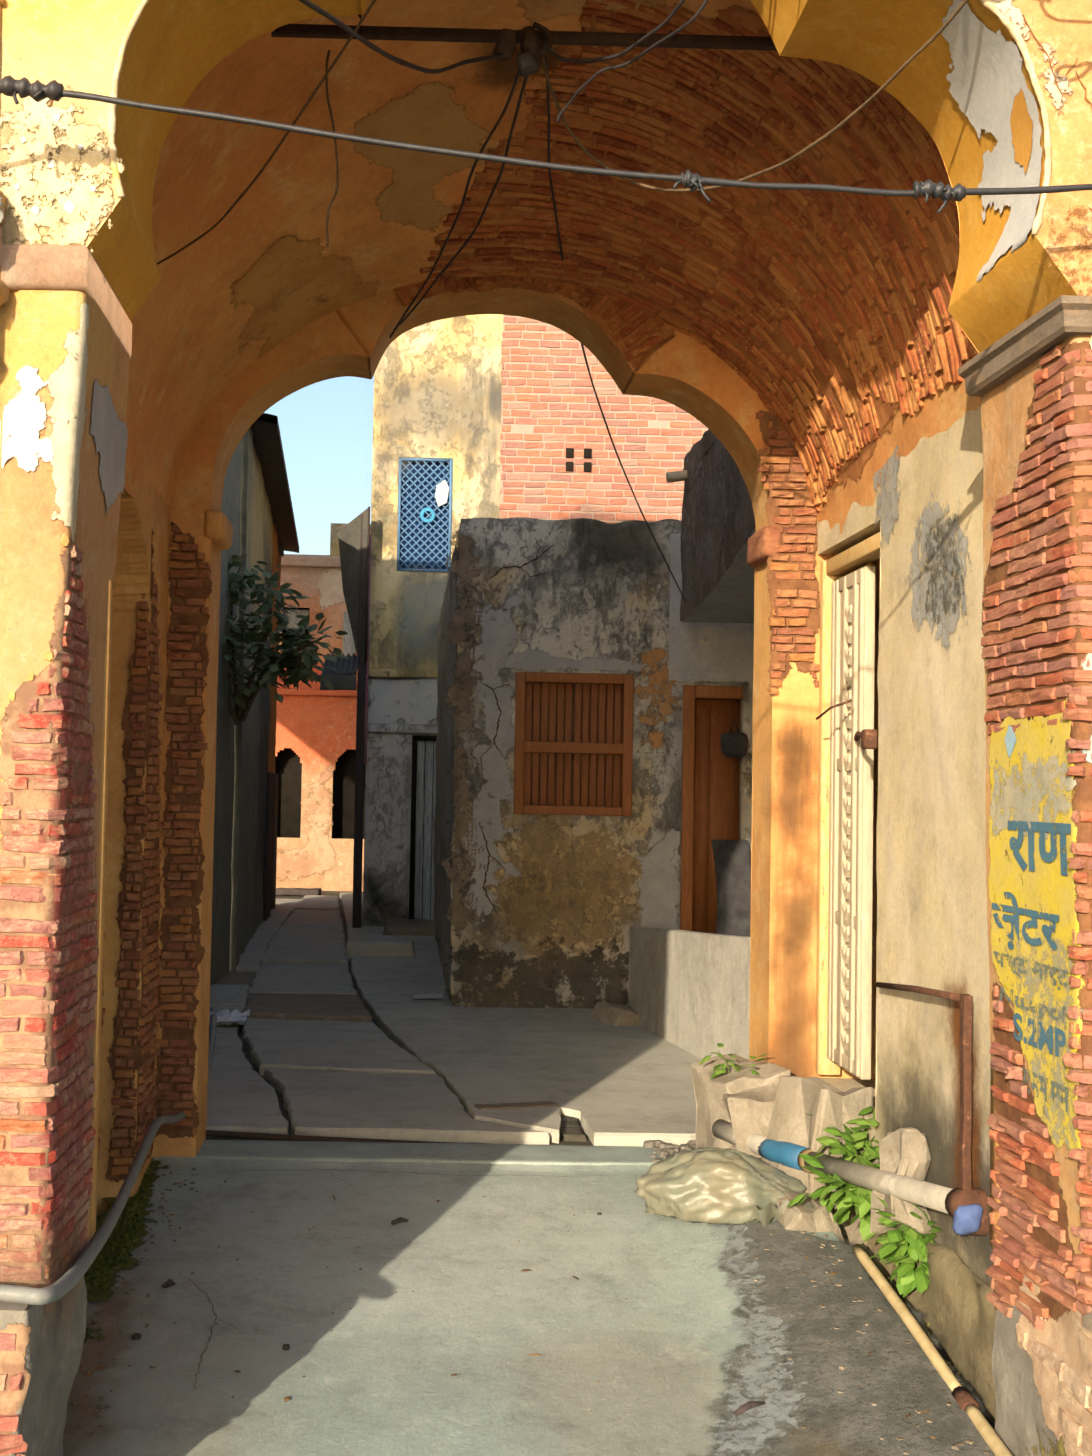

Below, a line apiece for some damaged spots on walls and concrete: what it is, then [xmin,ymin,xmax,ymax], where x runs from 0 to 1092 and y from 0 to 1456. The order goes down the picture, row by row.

peeling [0,81,126,254]
peeling [942,0,1092,296]
crack [1023,14,1092,107]
flaking render [353,0,979,697]
leakage [924,514,964,625]
flaking render [0,302,213,1288]
peeling [367,526,527,945]
leakage [436,936,629,1009]
flaking render [904,337,1092,1456]
spalling [560,1115,586,1142]
spalling [691,1054,931,1245]
flaking render [0,1323,31,1456]